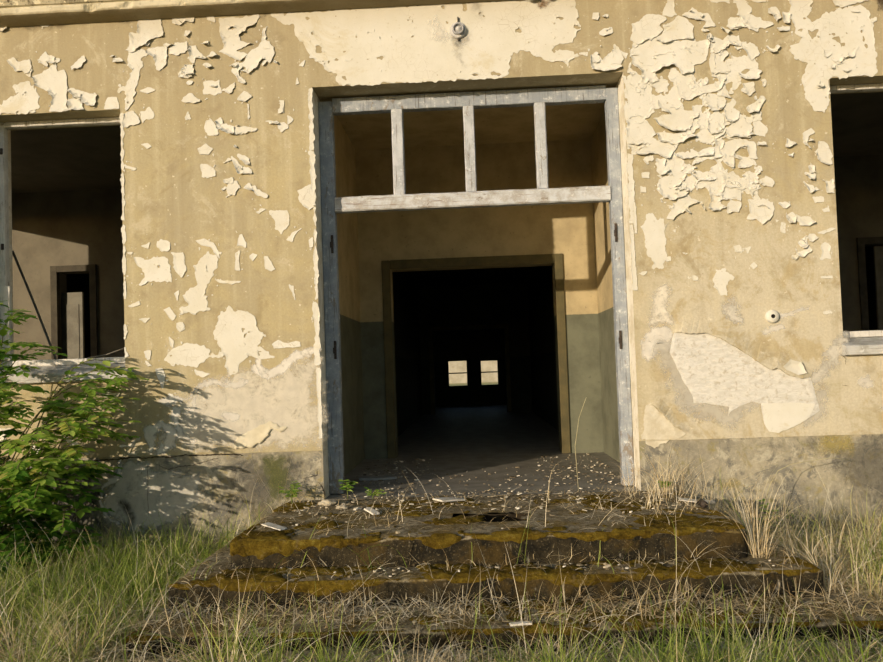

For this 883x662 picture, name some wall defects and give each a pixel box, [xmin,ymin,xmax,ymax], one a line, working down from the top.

peeling [0,14,322,439]
water stain [2,347,323,543]
peeling [271,0,878,290]
flaking render [641,398,690,448]
peeling [713,268,734,296]
flaking render [670,313,820,433]